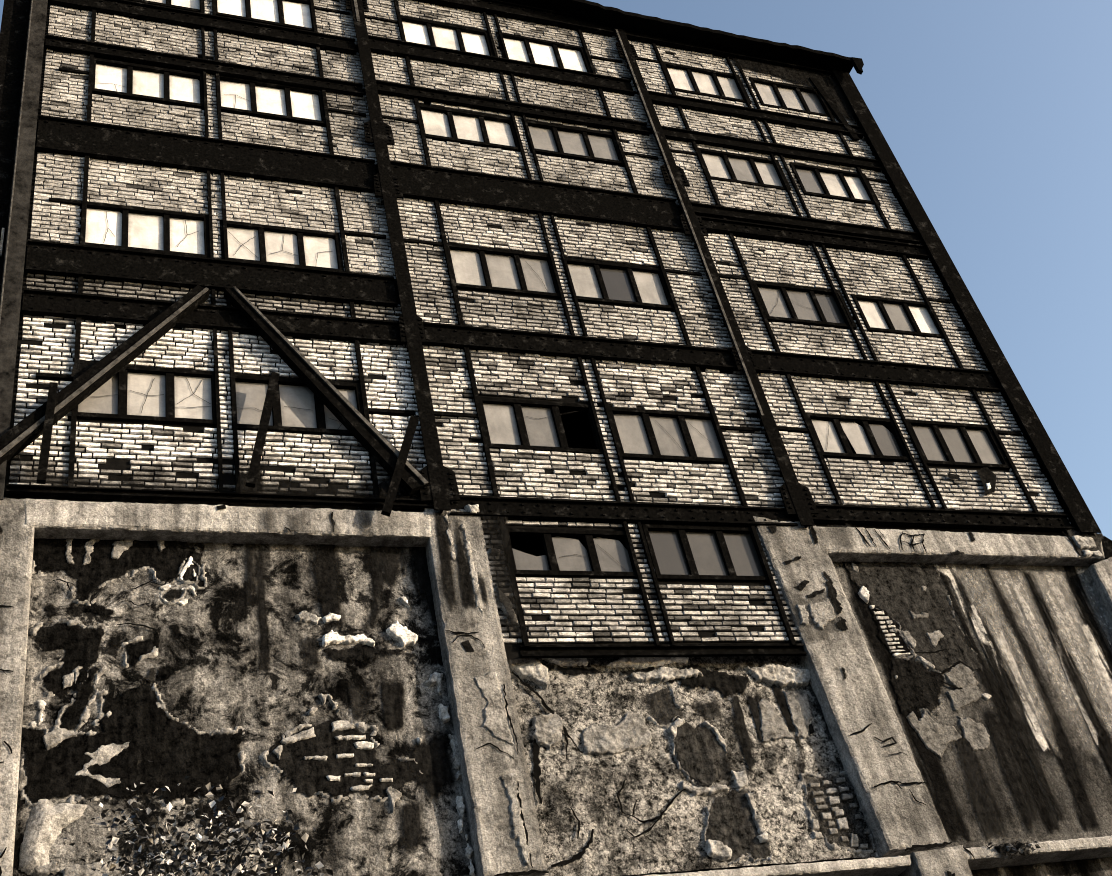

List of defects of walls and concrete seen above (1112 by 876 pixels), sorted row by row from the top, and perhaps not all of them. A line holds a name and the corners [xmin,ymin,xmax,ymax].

flaking render [0,538,423,813]
spalling [445,630,485,652]
spalling [464,504,525,642]
crack [494,807,594,876]
crack [511,671,582,804]
crack [617,779,686,838]
flaking render [507,657,833,864]
spalling [793,571,848,631]
flaking render [799,771,875,855]
leakage [842,562,970,842]
flaking render [844,562,992,759]
leakage [934,564,1112,839]